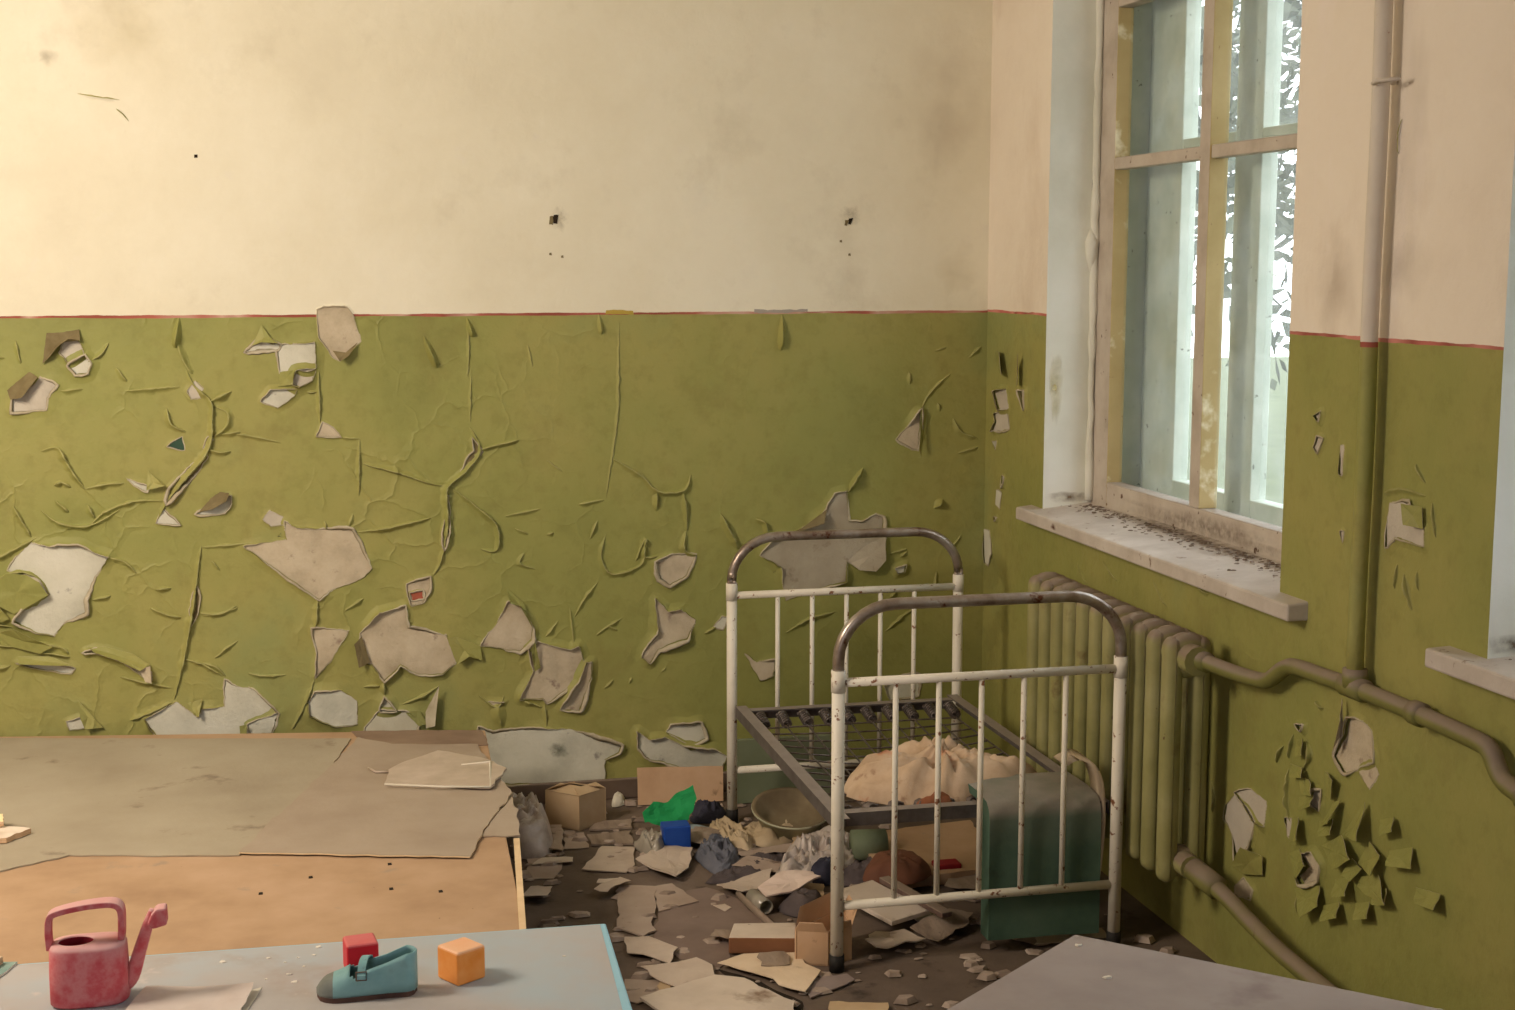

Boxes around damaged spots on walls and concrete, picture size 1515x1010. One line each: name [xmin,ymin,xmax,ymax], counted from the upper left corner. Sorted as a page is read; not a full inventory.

peeling [4,329,100,419]
peeling [237,303,363,414]
peeling [0,536,158,683]
crack [0,341,314,730]
spalling [122,433,237,528]
peeling [134,506,727,787]
crack [364,657,548,730]
crack [307,322,697,643]
crack [786,611,836,633]
peeling [753,485,910,607]
crack [885,498,961,632]
peeling [1222,700,1413,921]